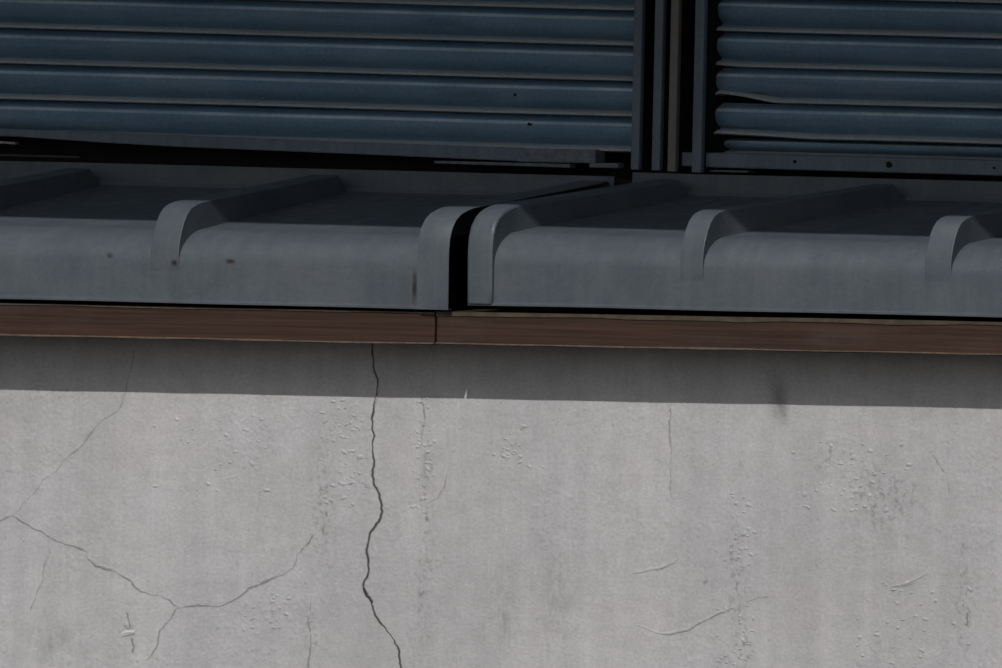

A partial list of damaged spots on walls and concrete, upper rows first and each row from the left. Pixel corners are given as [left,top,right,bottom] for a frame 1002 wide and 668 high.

crack [361,344,402,668]